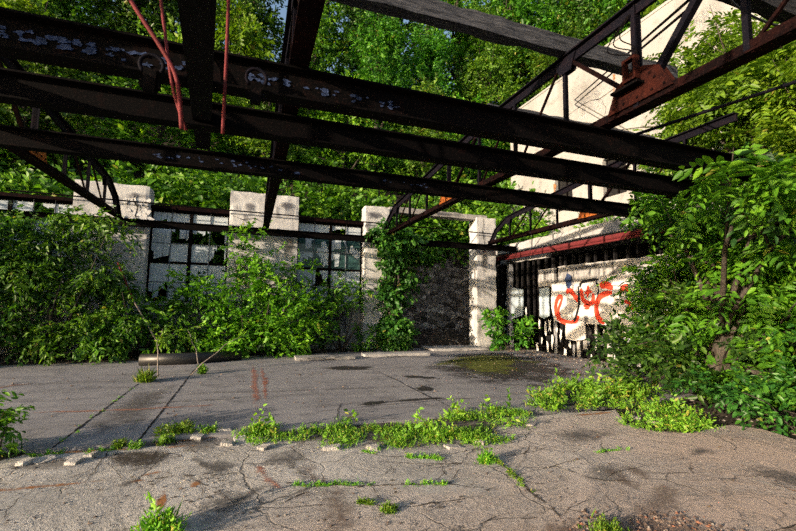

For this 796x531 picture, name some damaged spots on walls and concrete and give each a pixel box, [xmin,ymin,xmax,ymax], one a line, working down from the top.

peeling [0,25,185,70]
peeling [248,73,291,87]
leakage [399,353,576,401]
crack [70,452,124,485]
crack [192,478,245,507]
crack [332,444,642,530]